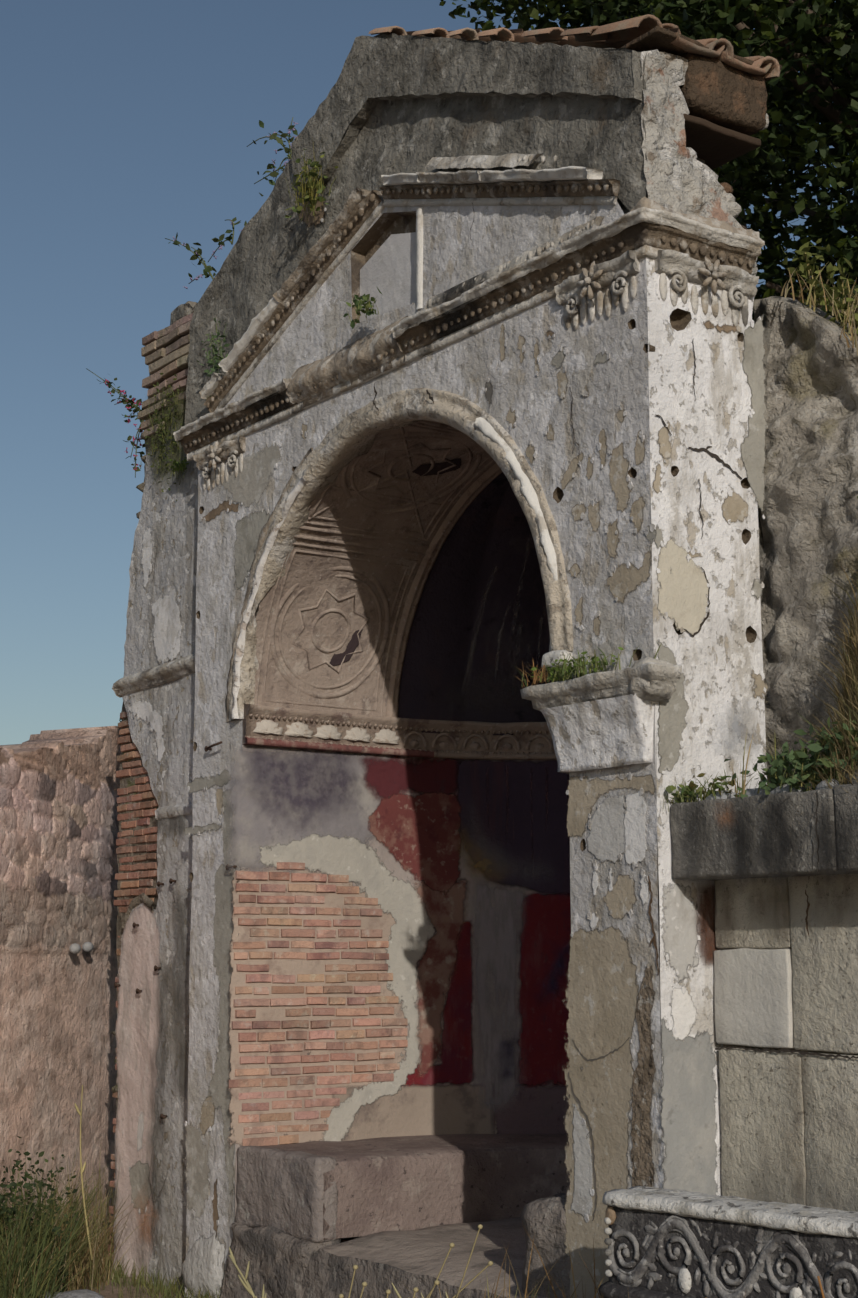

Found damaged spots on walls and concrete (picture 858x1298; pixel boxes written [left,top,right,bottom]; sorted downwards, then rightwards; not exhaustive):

spalling [640,49,744,229]
flaking render [703,316,768,524]
flaking render [151,588,182,665]
leakage [257,756,351,810]
flaking render [561,421,709,636]
crack [656,415,742,637]
spalling [751,579,764,599]
flaking render [751,670,769,702]
flaking render [184,749,467,1237]
flaking render [563,641,701,1298]